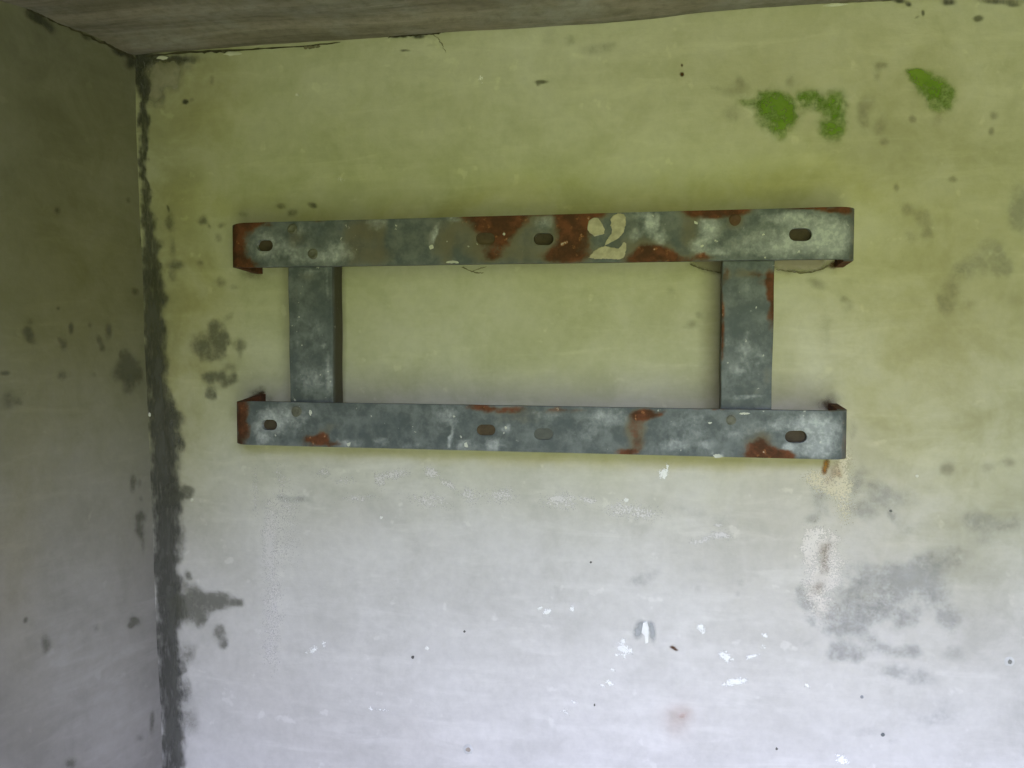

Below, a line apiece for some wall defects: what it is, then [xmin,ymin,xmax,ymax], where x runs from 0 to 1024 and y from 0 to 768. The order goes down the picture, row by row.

damp [117,83,242,768]
damp [800,445,858,630]
flaking render [600,621,655,688]